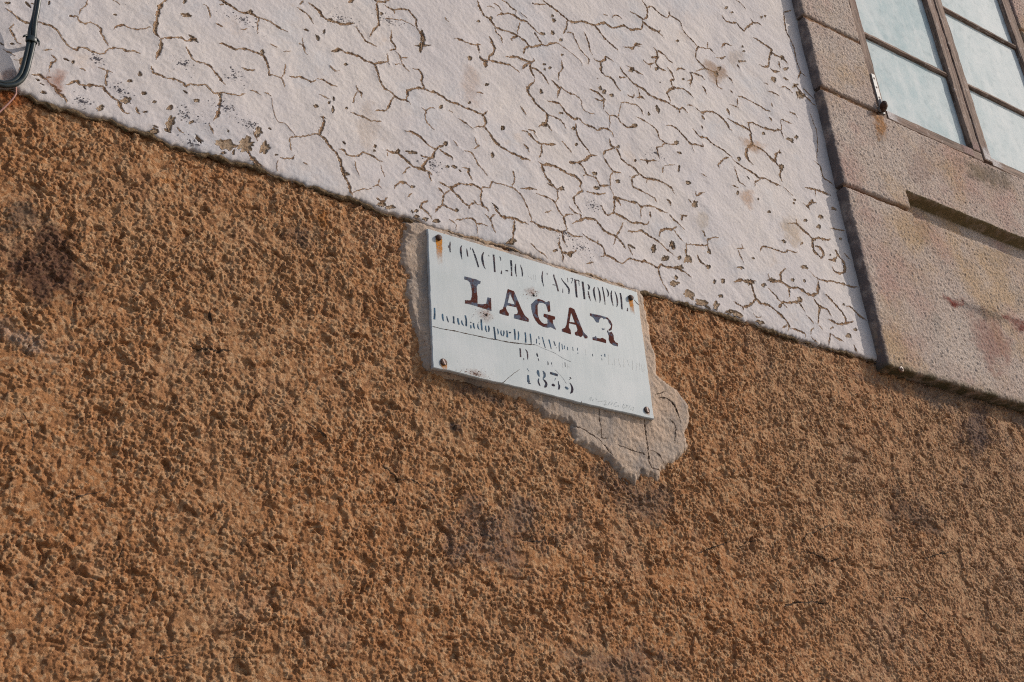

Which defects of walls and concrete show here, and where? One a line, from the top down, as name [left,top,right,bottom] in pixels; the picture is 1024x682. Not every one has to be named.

spalling [120,92,175,134]
spalling [189,120,278,156]
crack [5,0,867,353]
spalling [651,241,743,318]
crack [433,326,681,475]